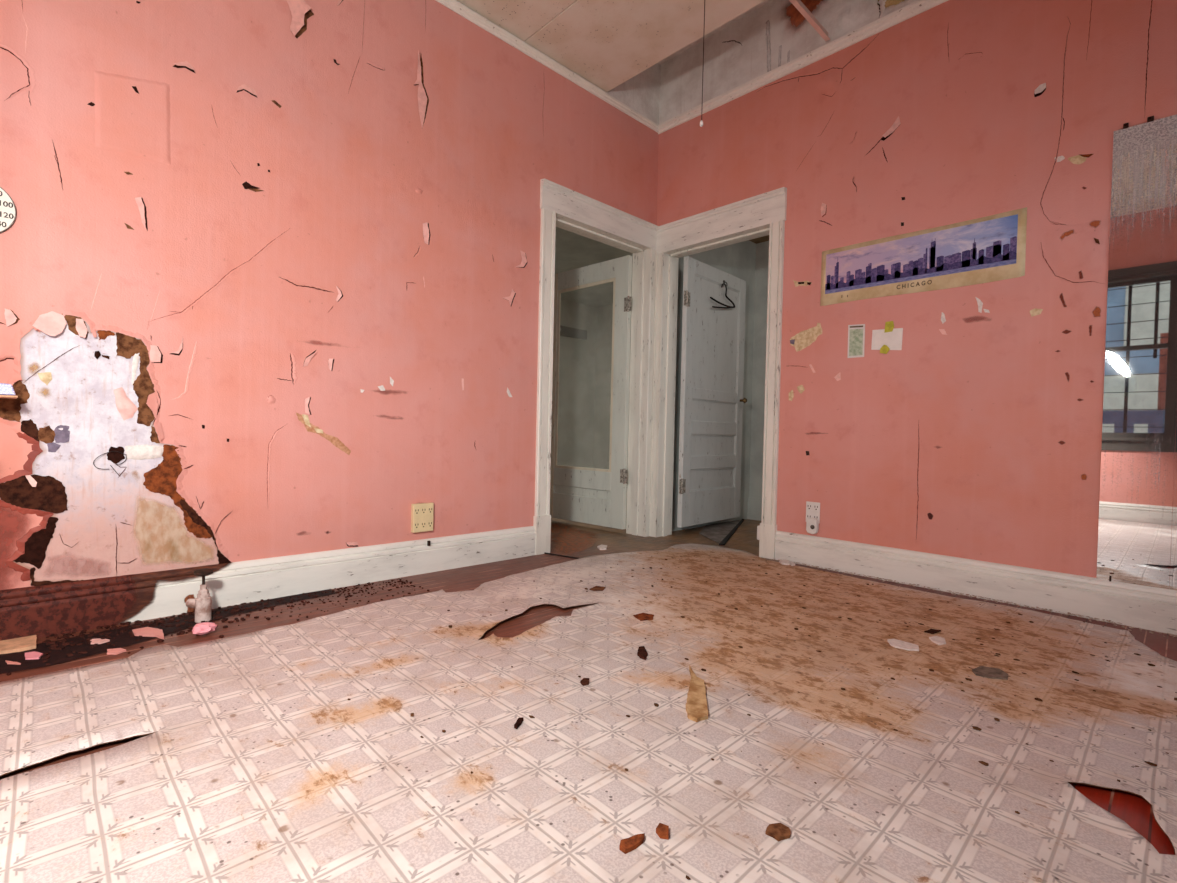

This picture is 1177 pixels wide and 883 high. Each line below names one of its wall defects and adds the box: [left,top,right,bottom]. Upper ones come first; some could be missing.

crack [0,3,36,104]
peeling [287,0,314,38]
peeling [414,50,429,128]
peeling [864,116,901,163]
crack [1040,0,1092,224]
crack [1144,0,1153,118]
peeling [125,197,148,231]
crack [147,228,334,329]
crack [277,353,298,385]
flaking render [0,309,232,586]